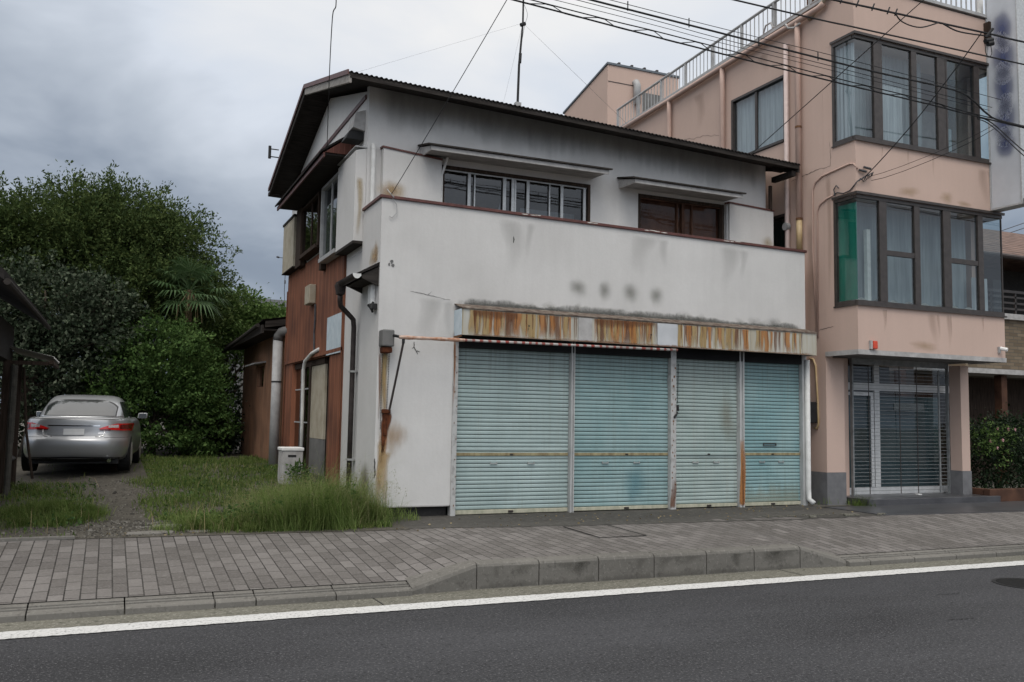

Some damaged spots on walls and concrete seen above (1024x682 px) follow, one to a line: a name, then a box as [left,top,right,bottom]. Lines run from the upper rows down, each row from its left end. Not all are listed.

rust [469,310,809,355]
rust [377,353,393,489]